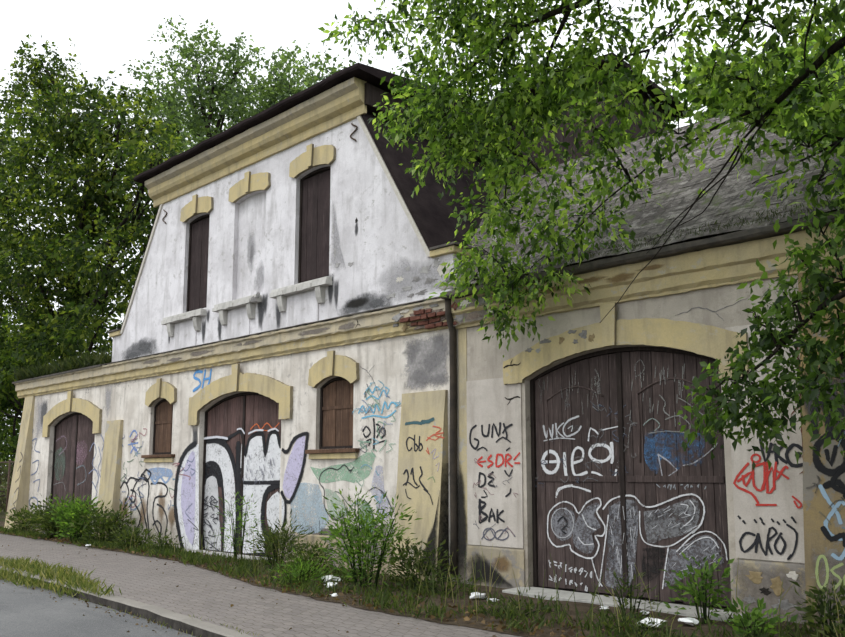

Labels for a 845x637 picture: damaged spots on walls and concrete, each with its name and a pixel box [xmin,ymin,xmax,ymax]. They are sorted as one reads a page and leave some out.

peeling [386,258,452,299]
water stain [299,276,390,335]
crack [675,298,747,321]
water stain [202,311,221,340]
water stain [125,339,181,364]
peeling [392,293,500,389]
spalling [525,330,595,353]